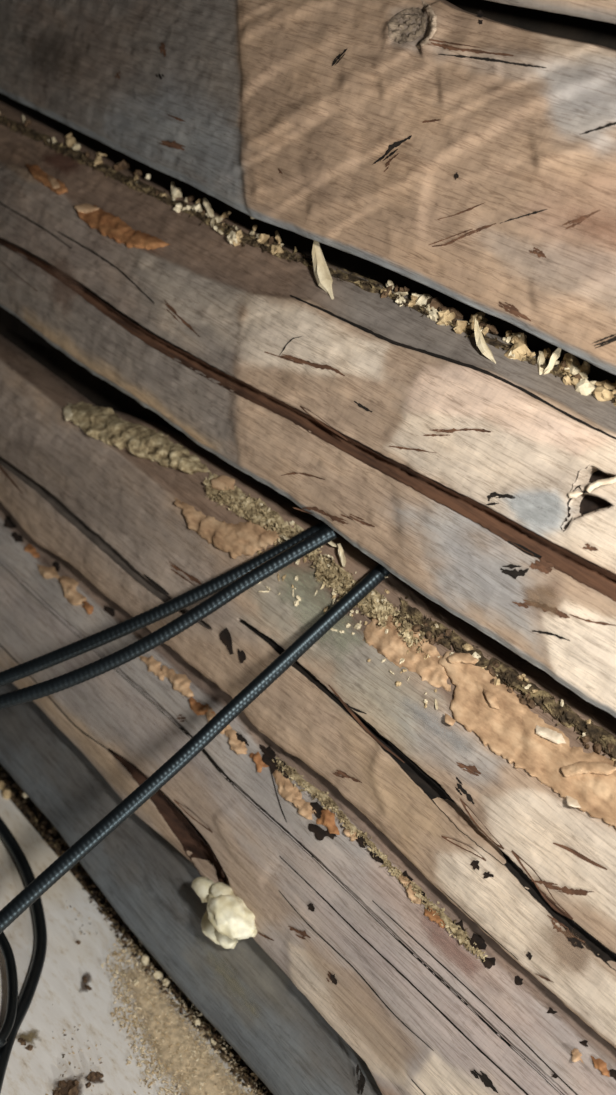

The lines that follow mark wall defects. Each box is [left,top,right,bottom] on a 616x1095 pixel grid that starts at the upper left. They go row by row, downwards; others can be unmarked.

crack [0,458,211,629]
crack [0,202,616,601]
crack [0,564,616,1095]